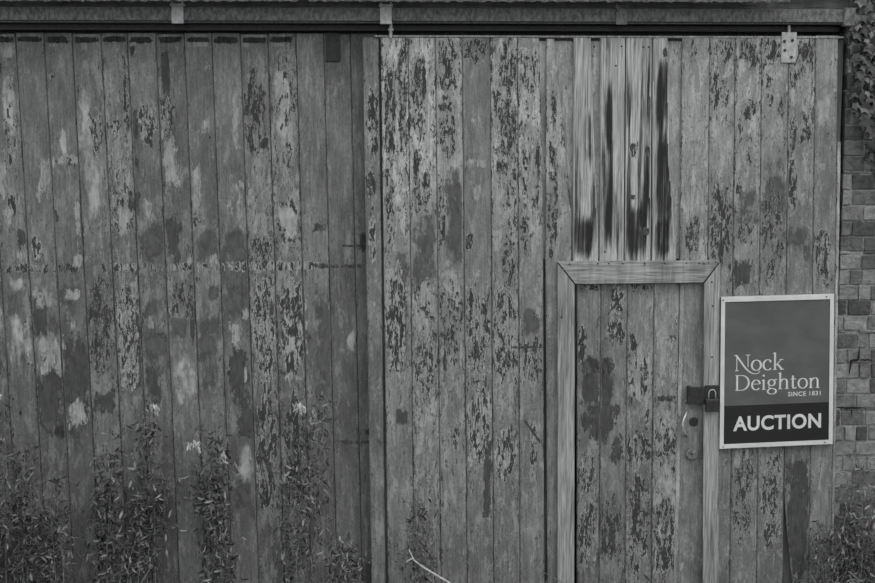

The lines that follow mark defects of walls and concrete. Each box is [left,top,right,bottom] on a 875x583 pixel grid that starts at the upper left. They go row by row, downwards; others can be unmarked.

peeling [89,39,177,159]
peeling [7,190,16,221]
peeling [86,266,140,391]
peeling [112,155,141,248]
peeling [169,264,200,319]
peeling [313,37,567,489]
peeling [682,38,814,295]
peeling [815,226,833,287]
peeling [577,283,681,582]